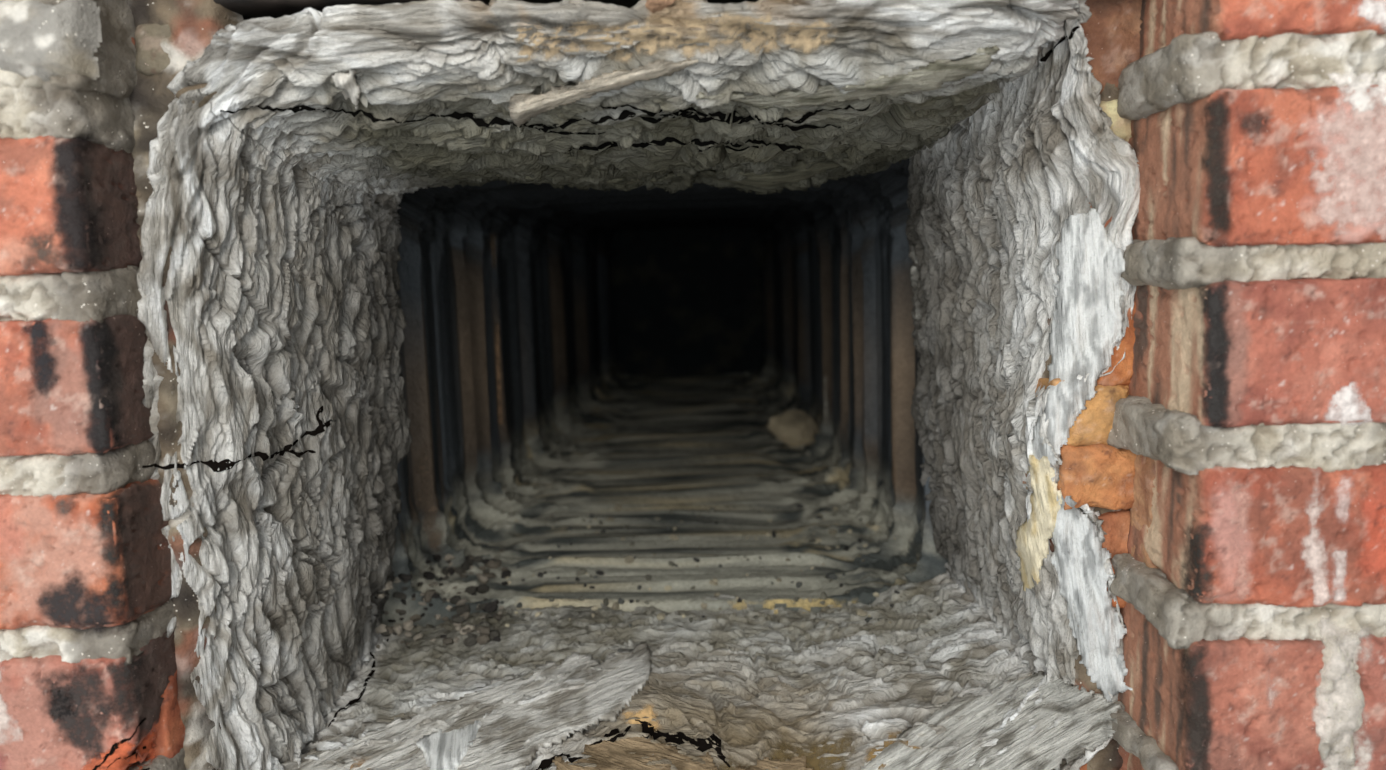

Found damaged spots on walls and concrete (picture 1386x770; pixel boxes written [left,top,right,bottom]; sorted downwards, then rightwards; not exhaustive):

leakage [1311,72,1386,238]
crack [142,406,337,472]
crack [328,652,375,727]
spalling [83,718,155,770]
crack [536,720,731,770]